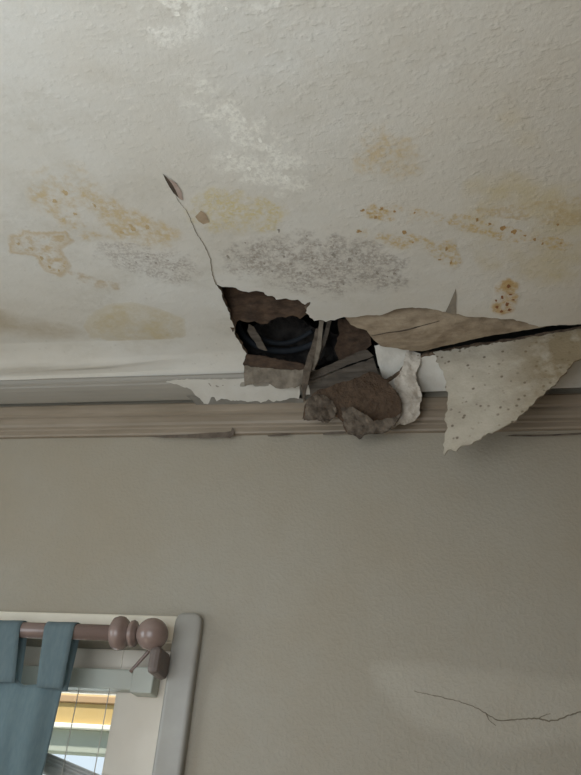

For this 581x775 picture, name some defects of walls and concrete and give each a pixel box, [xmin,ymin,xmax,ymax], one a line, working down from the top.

water stain [347,118,437,186]
crack [175,195,217,285]
water stain [7,156,423,304]
water stain [454,167,581,295]
water stain [0,302,186,341]
spalling [301,314,345,335]
spalling [314,337,379,370]
spalling [414,324,581,353]
crack [415,691,581,726]